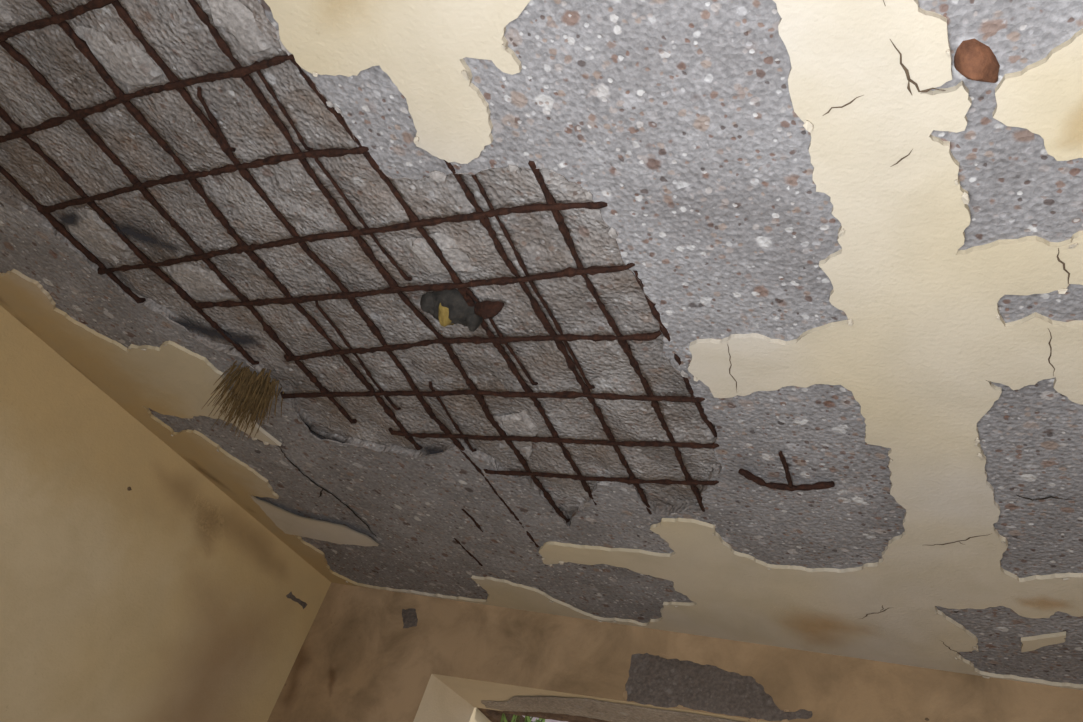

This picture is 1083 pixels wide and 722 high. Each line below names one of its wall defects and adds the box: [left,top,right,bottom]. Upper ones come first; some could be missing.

crack [890,39,946,95]
flaking render [918,0,1083,250]
flaking render [0,0,906,623]
flaking render [996,284,1083,323]
flaking render [975,377,1083,581]
flaking render [402,608,418,628]
flaking render [935,606,1083,684]
flaking render [478,653,813,722]